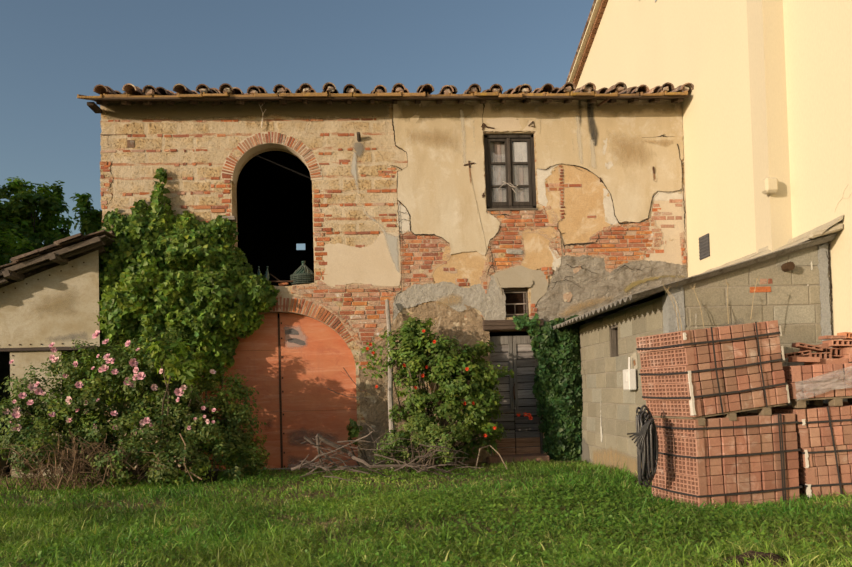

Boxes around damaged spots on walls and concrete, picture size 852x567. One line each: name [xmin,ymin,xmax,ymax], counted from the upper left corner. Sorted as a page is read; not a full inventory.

water stain [494,100,675,167]
spalling [479,165,687,294]
spalling [291,231,470,349]